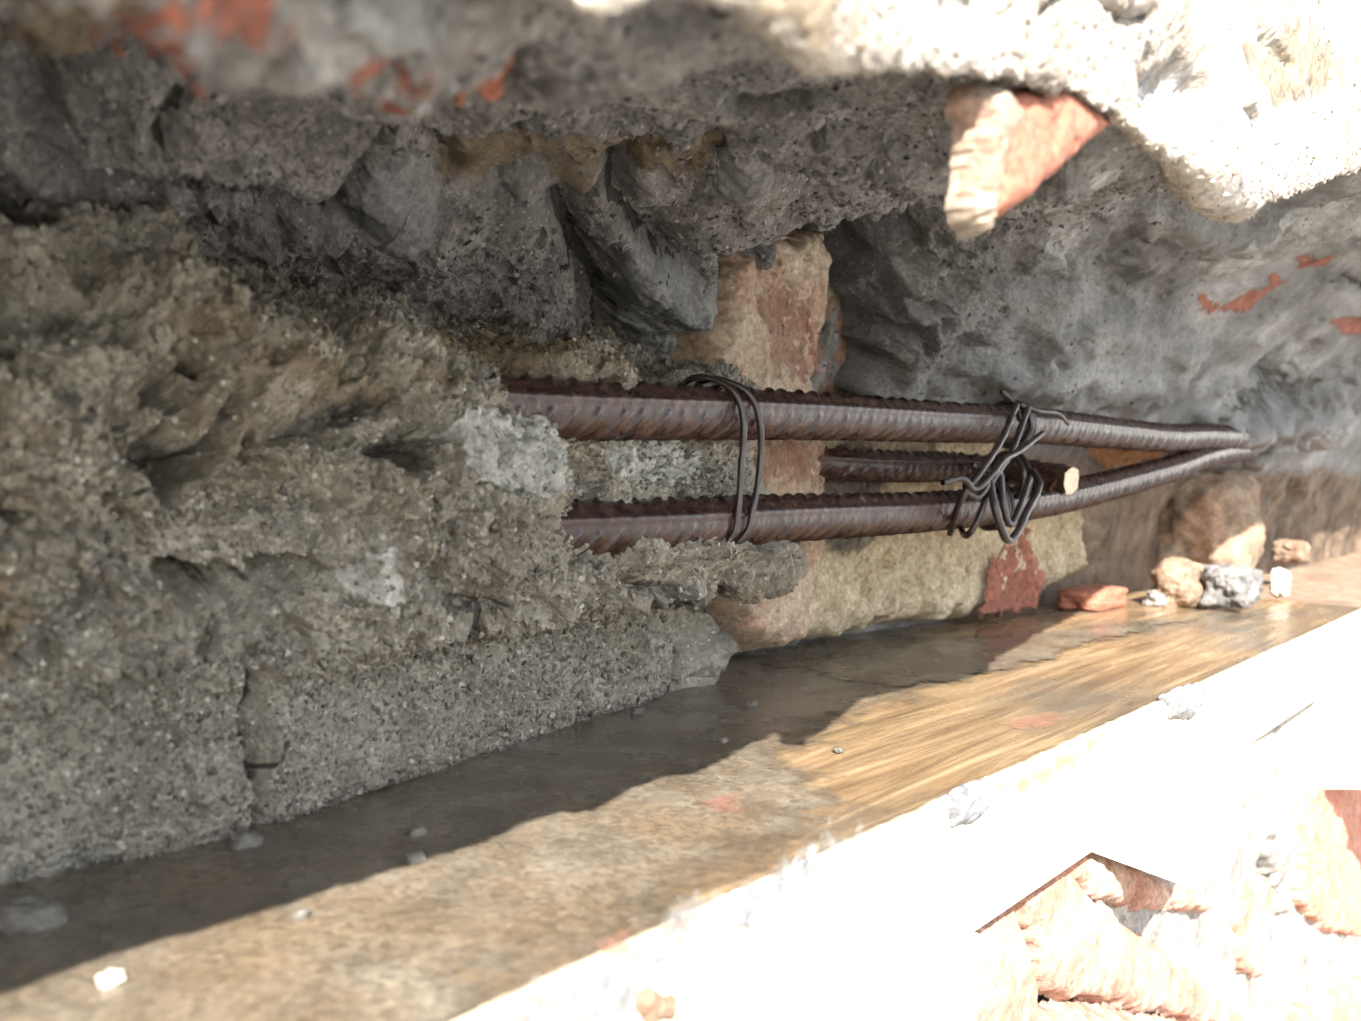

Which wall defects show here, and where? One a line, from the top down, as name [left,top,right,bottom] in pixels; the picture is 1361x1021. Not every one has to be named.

spalling [454,54,514,107]
spalling [738,88,812,116]
spalling [1137,59,1230,149]
spalling [173,366,198,380]
spalling [281,389,396,438]
spalling [125,408,234,478]
spalling [362,430,434,472]
rust [1087,448,1166,470]
spalling [491,364,1324,620]
spalling [441,593,509,619]
crack [236,669,290,780]